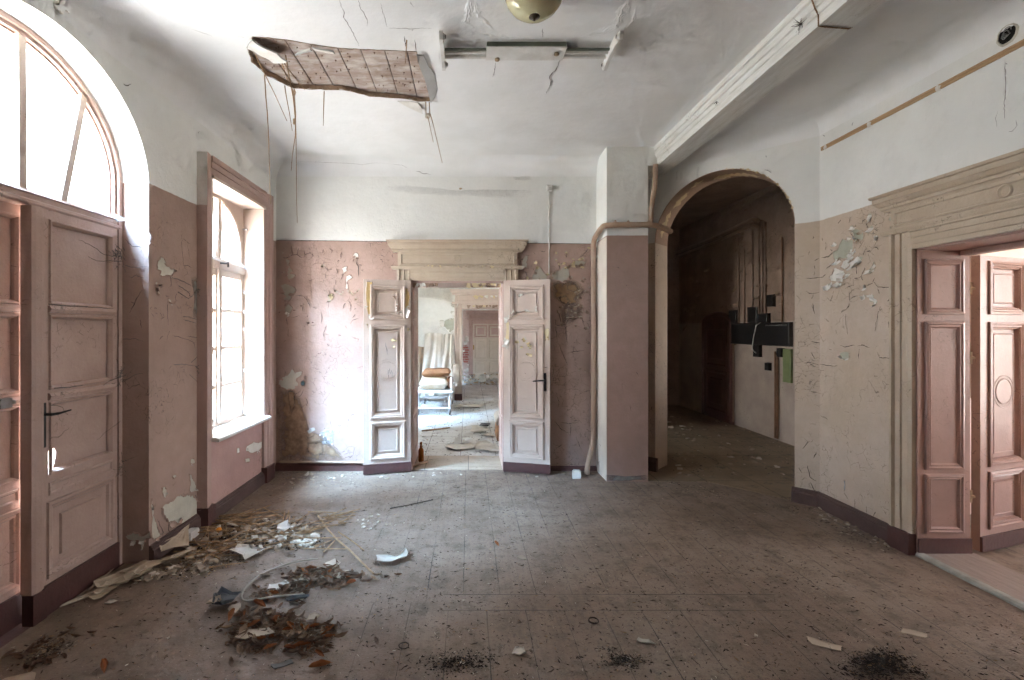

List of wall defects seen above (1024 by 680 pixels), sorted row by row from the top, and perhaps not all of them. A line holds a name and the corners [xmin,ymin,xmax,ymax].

crack [340,1,420,49]
crack [546,60,562,93]
crack [285,247,364,346]
peeling [327,252,374,326]
peeling [521,246,598,340]
crack [804,217,889,419]
peeling [822,213,878,307]
peeling [236,441,262,463]
damp [280,391,340,460]
spalling [126,457,200,550]